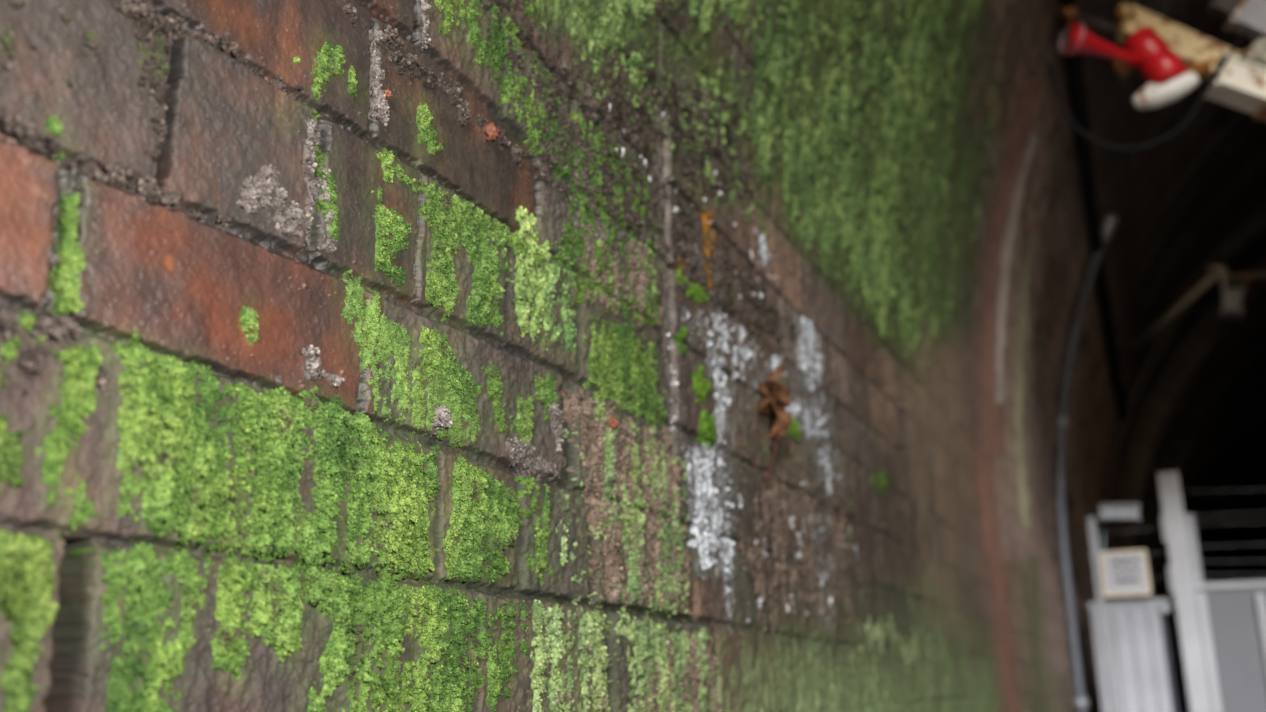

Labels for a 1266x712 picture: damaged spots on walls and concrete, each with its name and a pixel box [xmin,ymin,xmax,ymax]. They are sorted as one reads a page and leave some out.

damp [652,117,841,625]
damp [722,77,1070,712]